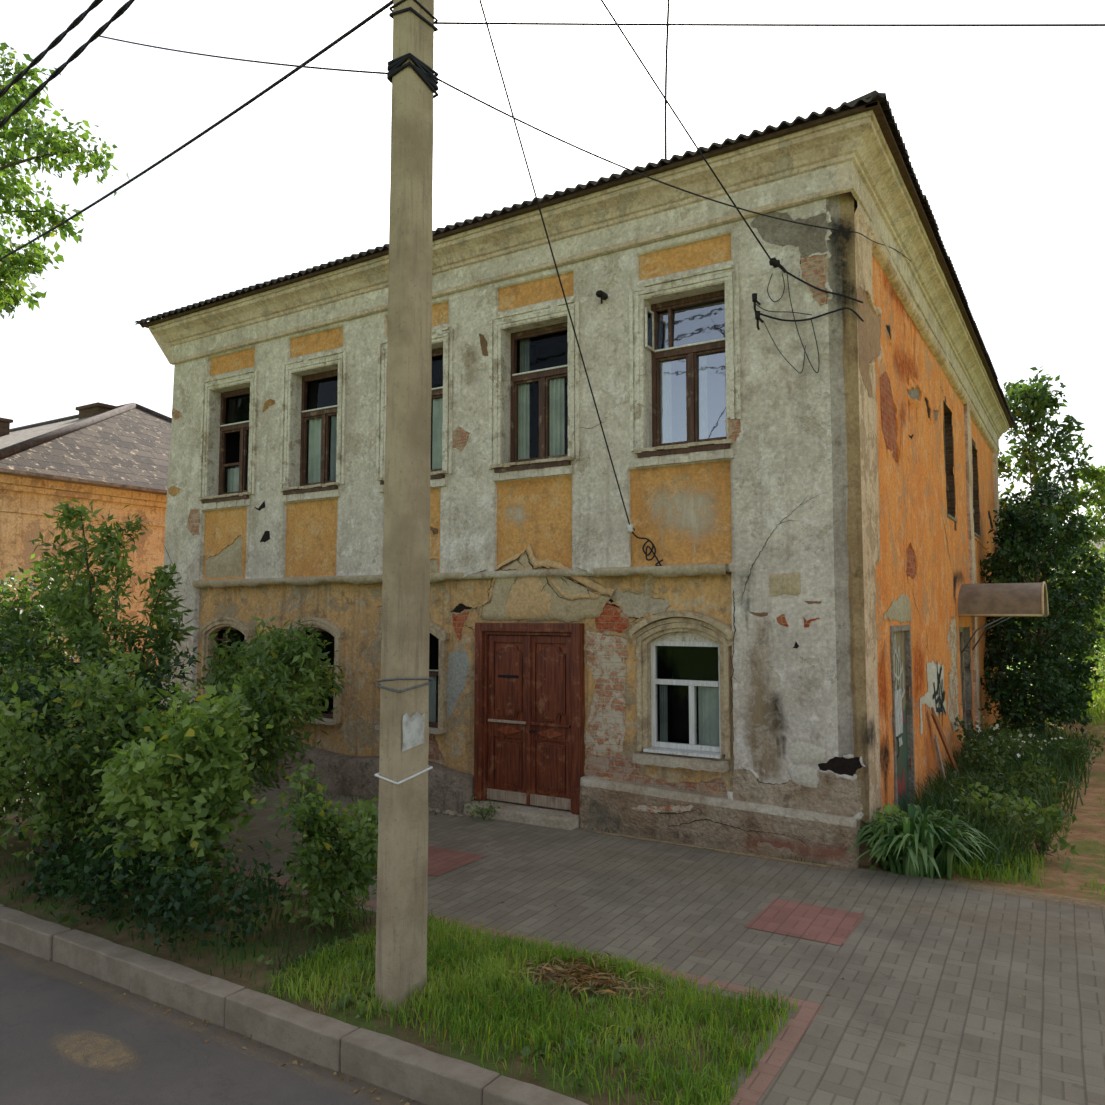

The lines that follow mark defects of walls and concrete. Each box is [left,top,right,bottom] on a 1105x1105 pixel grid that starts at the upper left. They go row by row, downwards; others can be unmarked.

flaking render [750,208,833,308]
damp [831,219,855,313]
flaking render [856,285,939,472]
flaking render [452,424,472,453]
flaking render [203,532,245,579]
spalling [259,529,272,544]
flaking render [904,537,918,588]
flaking render [446,552,866,820]